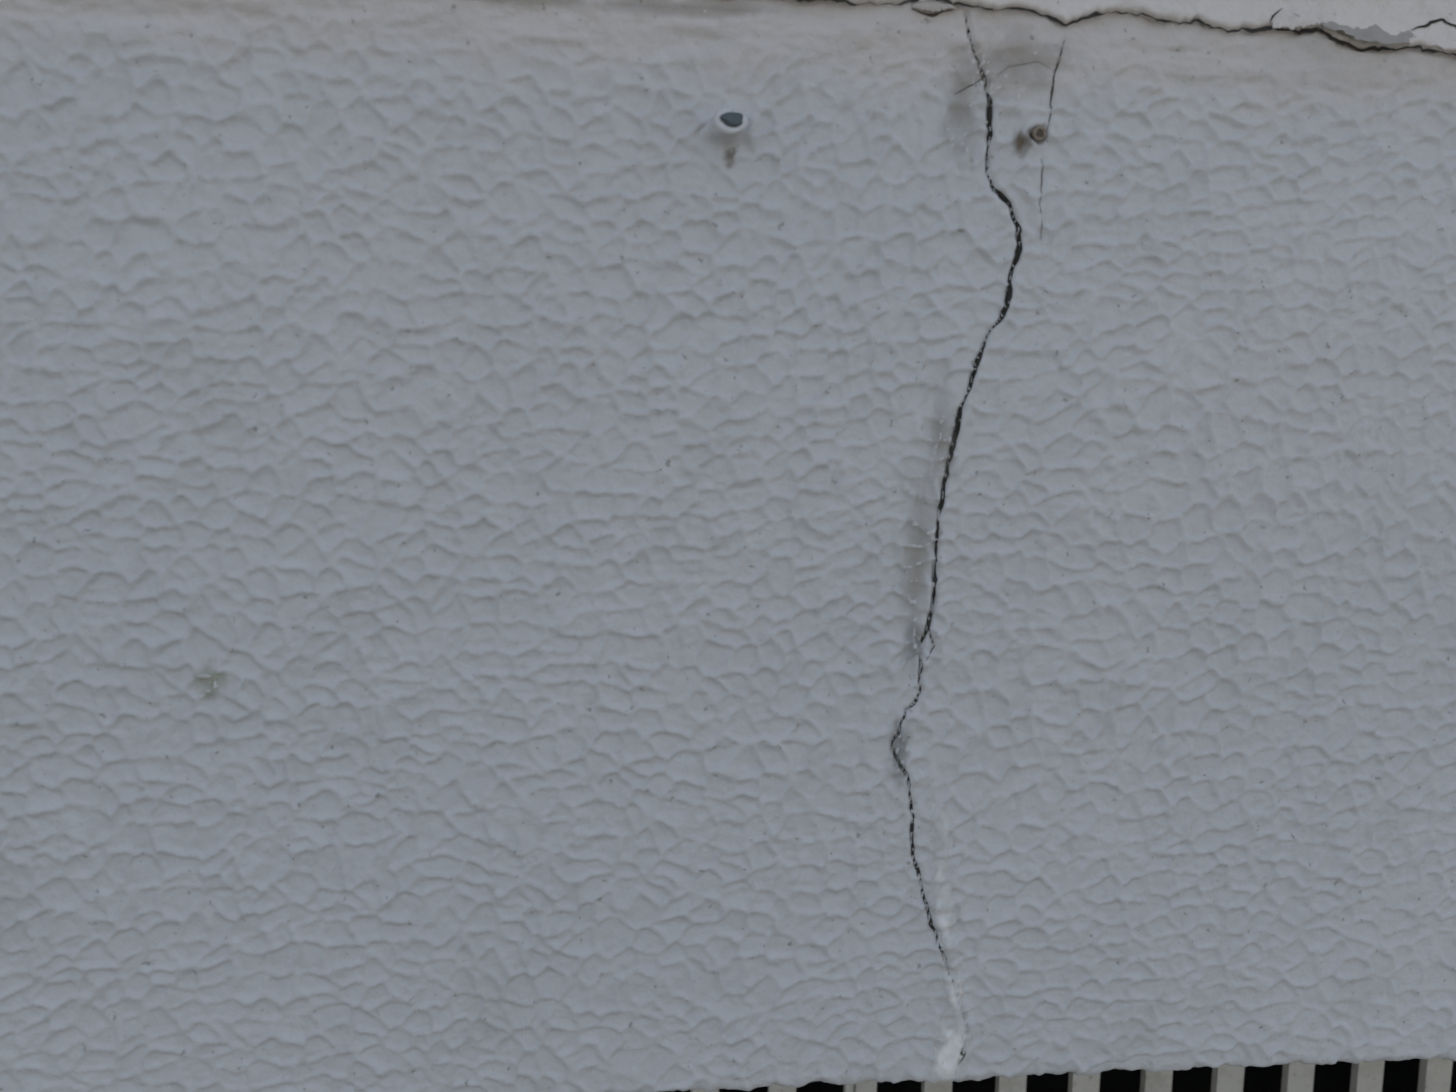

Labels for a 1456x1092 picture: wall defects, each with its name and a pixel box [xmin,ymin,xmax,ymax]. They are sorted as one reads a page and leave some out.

crack [796,0,1456,1065]
peeling [1272,8,1456,51]